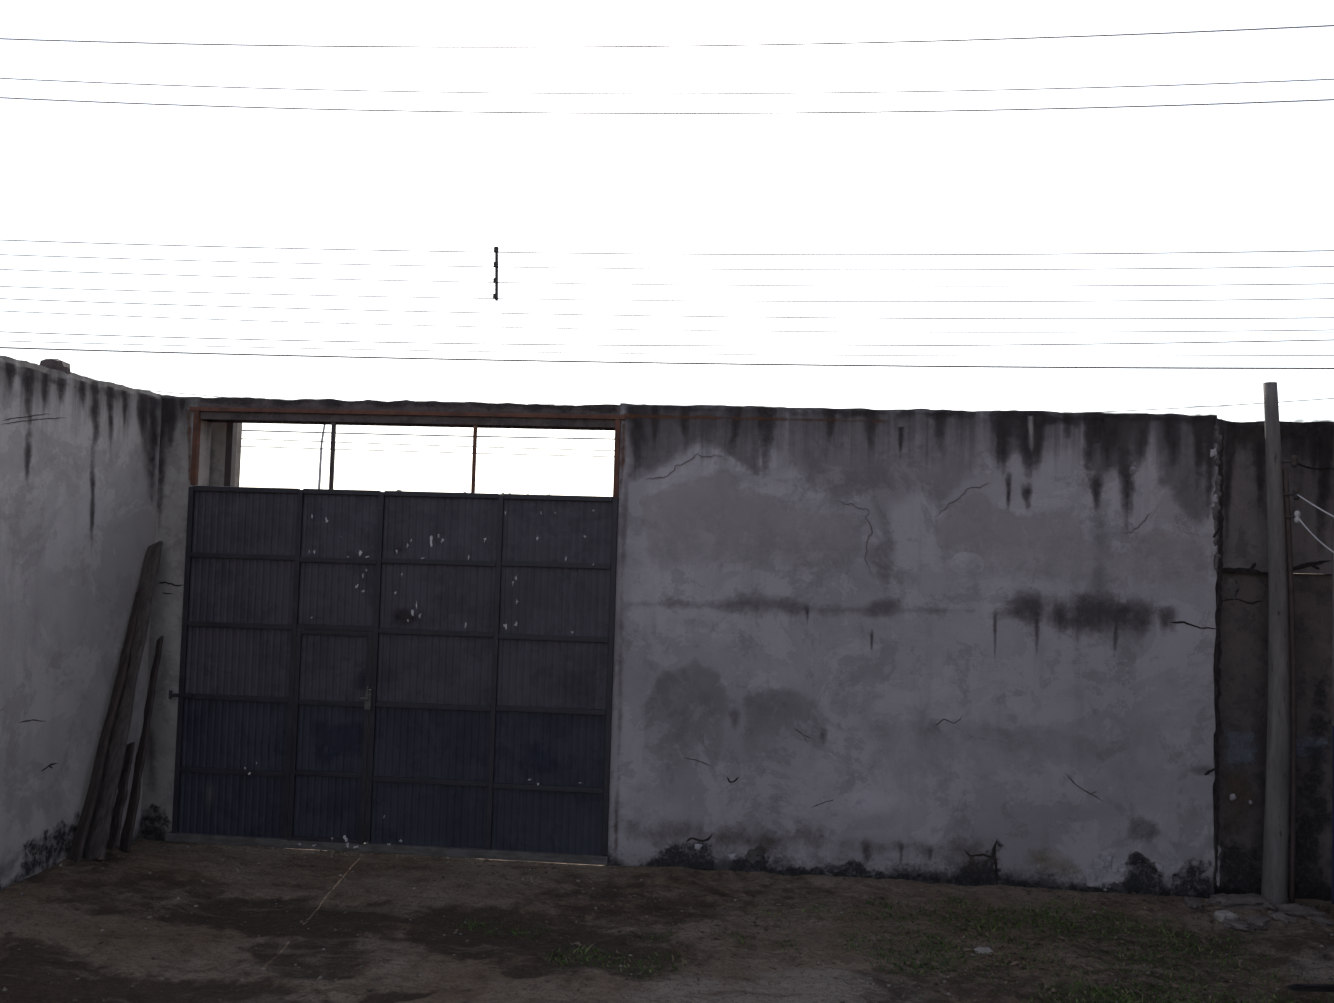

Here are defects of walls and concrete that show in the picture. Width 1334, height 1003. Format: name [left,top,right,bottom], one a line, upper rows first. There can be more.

leakage [8,362,65,416]
leakage [81,380,184,483]
leakage [476,402,699,450]
leakage [718,406,775,455]
leakage [825,409,877,443]
leakage [899,410,911,451]
leakage [927,410,964,438]
mould [0,814,79,891]
leakage [646,833,1262,898]